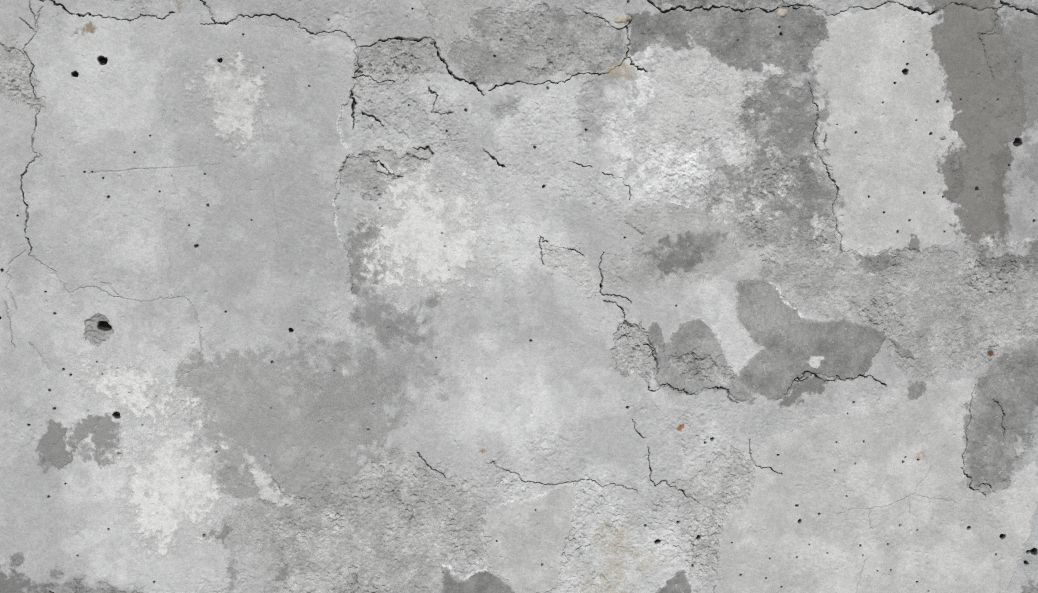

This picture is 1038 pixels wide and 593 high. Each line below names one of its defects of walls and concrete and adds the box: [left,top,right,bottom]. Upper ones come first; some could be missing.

crack [995,0,1038,15]
crack [200,0,945,130]
crack [5,0,221,377]
crack [370,160,404,178]
crack [413,146,435,157]
crack [484,148,506,169]
crack [568,161,631,201]
crack [808,82,843,254]
crack [539,236,632,321]
spalling [340,0,1038,495]
crack [486,420,718,516]
crack [836,385,1006,529]